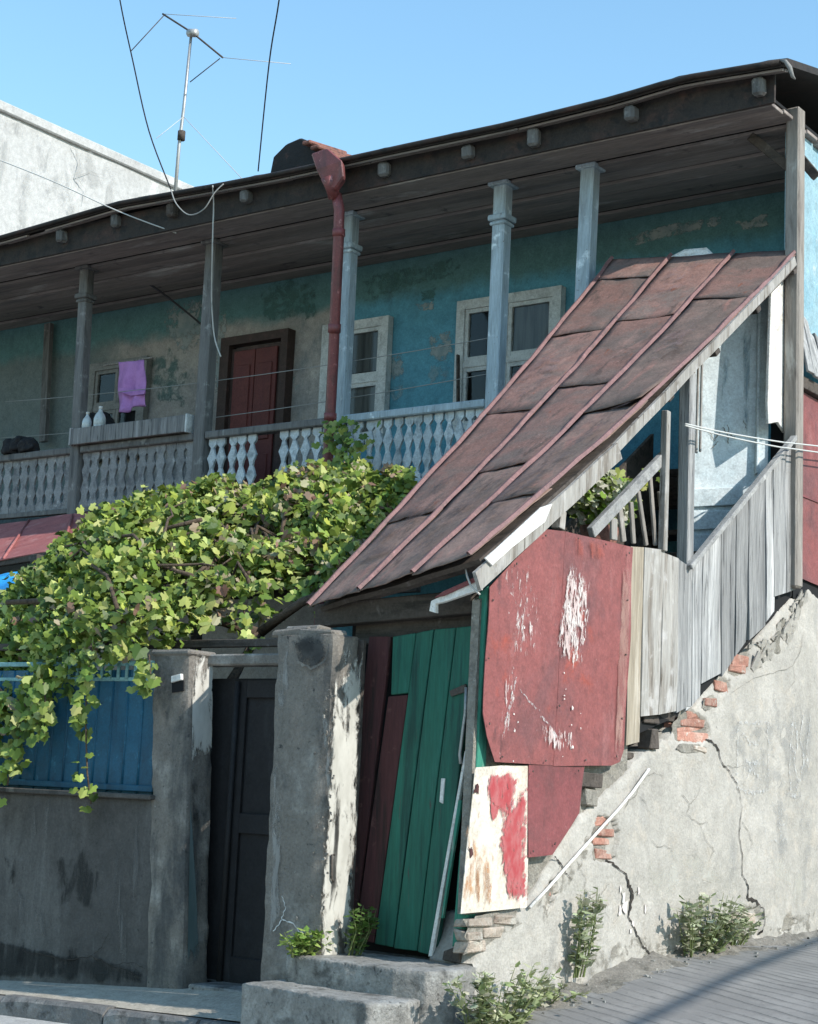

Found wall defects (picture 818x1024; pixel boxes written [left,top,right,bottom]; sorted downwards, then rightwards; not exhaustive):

peeling [192,656,213,759]
peeling [560,571,589,674]
spalling [664,590,808,753]
peeling [270,806,280,933]
peeling [310,660,362,955]
spalling [590,816,614,862]
crack [555,856,650,954]
crack [705,739,766,935]
leakage [0,943,141,982]